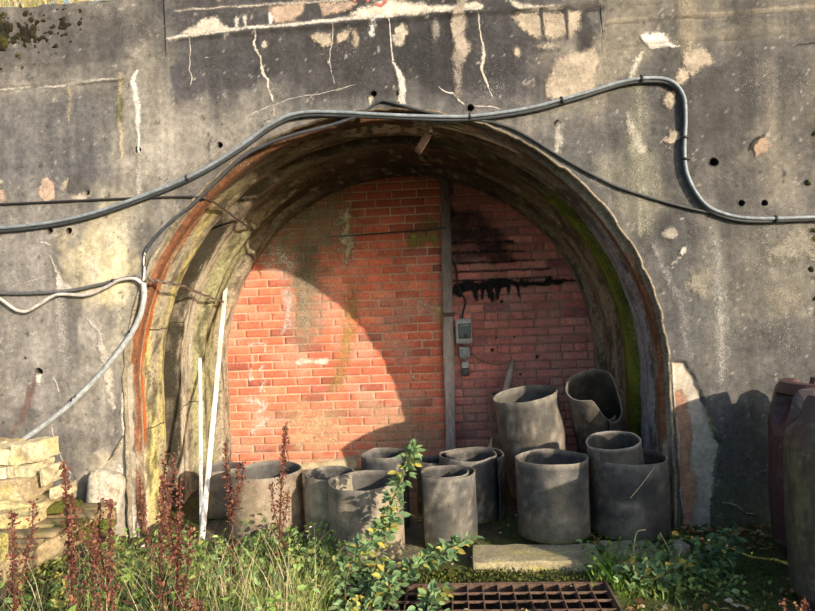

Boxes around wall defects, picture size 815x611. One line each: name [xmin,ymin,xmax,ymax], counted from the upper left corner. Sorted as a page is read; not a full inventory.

peeling [269,0,309,23]
peeling [319,1,356,16]
peeling [513,7,581,50]
crack [246,22,353,116]
crack [389,19,406,104]
crack [439,14,499,109]
peeling [545,48,599,100]
peeling [641,33,713,108]
peeling [664,131,681,144]
leakage [452,240,576,295]
corrosion [11,374,42,434]
spalling [672,362,719,527]